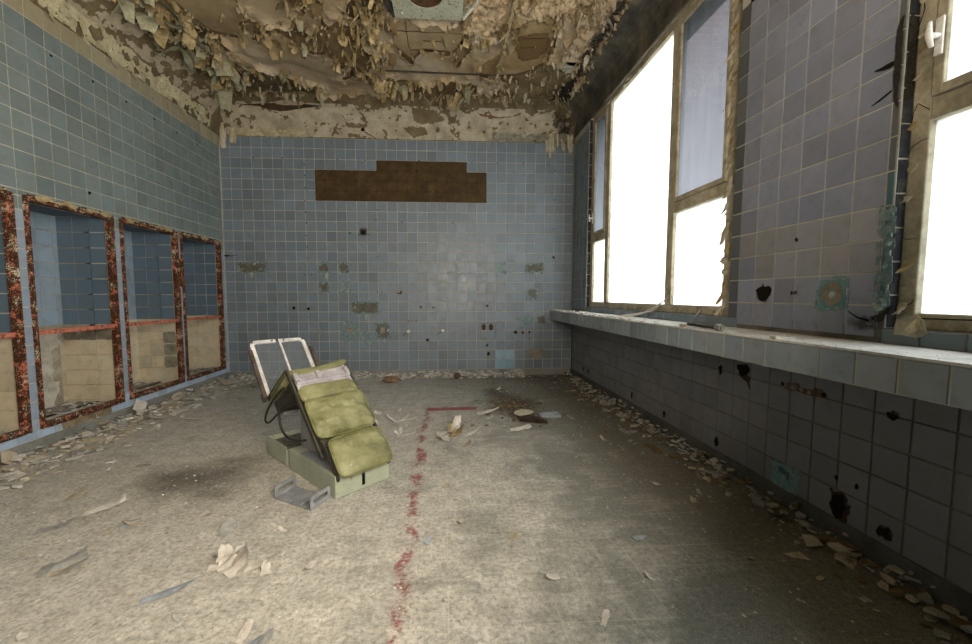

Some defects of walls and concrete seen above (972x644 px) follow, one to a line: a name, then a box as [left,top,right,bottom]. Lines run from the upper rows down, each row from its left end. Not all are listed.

peeling [67,0,632,158]
peeling [315,160,487,203]
peeling [712,98,736,316]
peeling [524,256,555,301]
spalling [756,284,772,302]
peeling [872,196,928,338]
peeling [349,300,392,343]
spalling [829,475,851,524]
spalling [875,524,893,542]